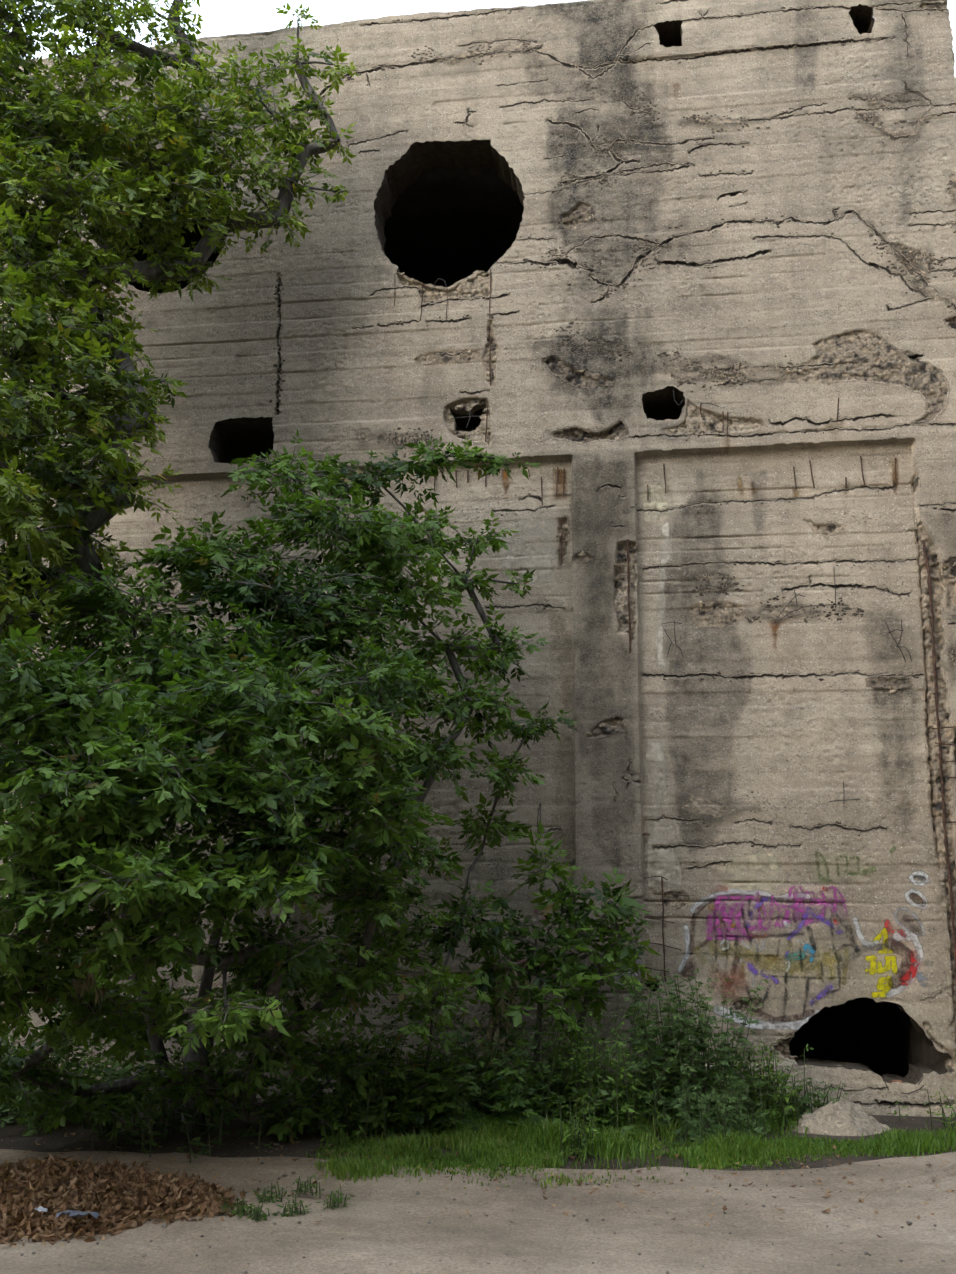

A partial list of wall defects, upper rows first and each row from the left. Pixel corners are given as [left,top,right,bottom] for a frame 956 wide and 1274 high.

water stain [549,0,670,160]
water stain [549,115,655,287]
crack [307,0,956,358]
spalling [357,269,499,458]
crack [459,388,488,396]
spalling [541,318,639,392]
water stain [552,320,654,420]
crack [692,362,833,386]
spalling [653,328,951,437]
water stain [643,488,669,537]
spalling [611,538,639,653]
spalling [865,458,956,1078]